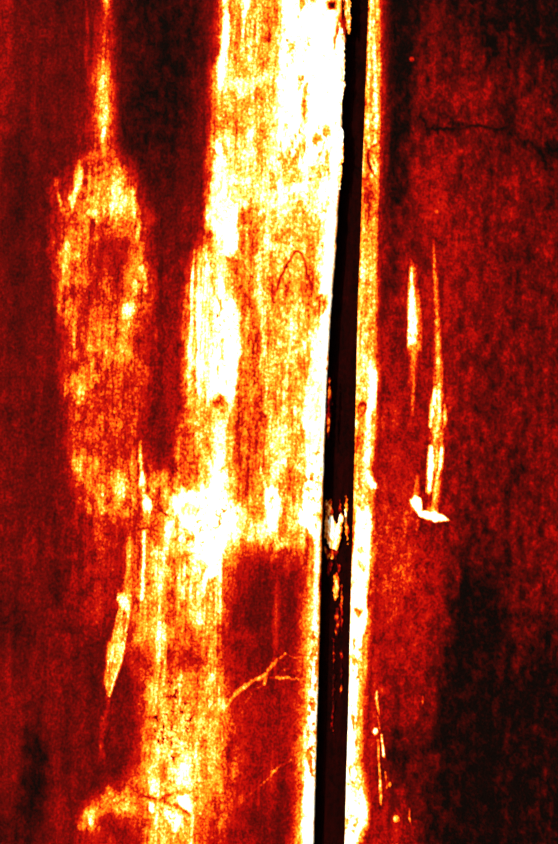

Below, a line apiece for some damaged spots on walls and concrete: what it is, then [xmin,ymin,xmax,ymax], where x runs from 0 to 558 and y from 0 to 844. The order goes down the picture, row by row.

corrosion [35,0,325,844]
peeling [155,0,396,844]
peeling [406,238,452,537]
peeling [147,759,194,835]
crack [226,652,304,715]